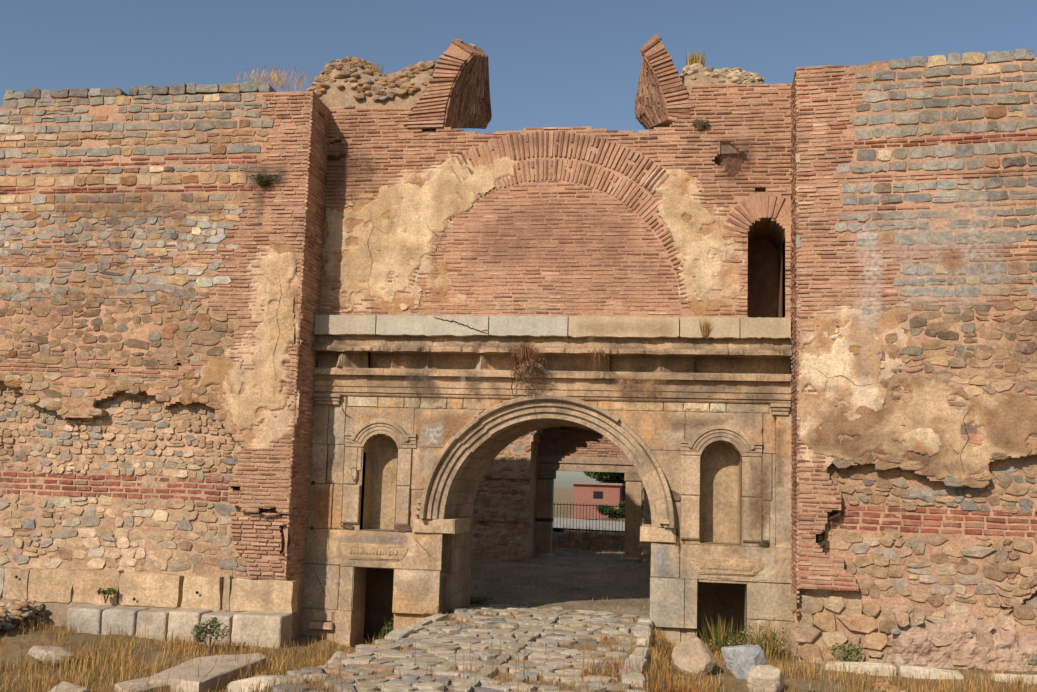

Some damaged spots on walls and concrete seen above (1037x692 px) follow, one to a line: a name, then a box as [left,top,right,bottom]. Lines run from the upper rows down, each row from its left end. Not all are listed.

flaking render [321,146,588,314]
flaking render [637,169,745,317]
peeling [86,408,107,416]
flaking render [194,244,303,450]
flaking render [797,304,1037,485]